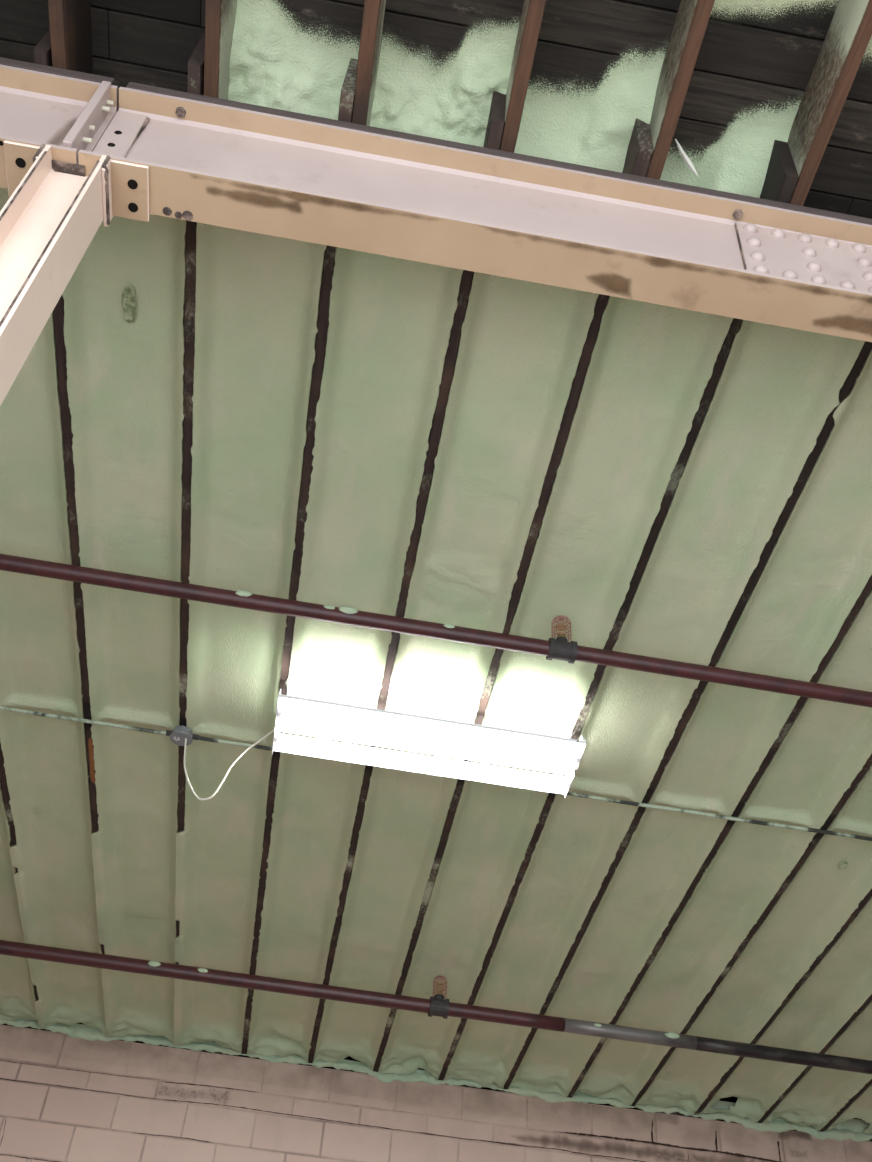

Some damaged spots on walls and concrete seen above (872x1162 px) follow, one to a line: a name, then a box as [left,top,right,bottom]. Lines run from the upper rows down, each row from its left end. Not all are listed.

leakage [541,1138,743,1162]